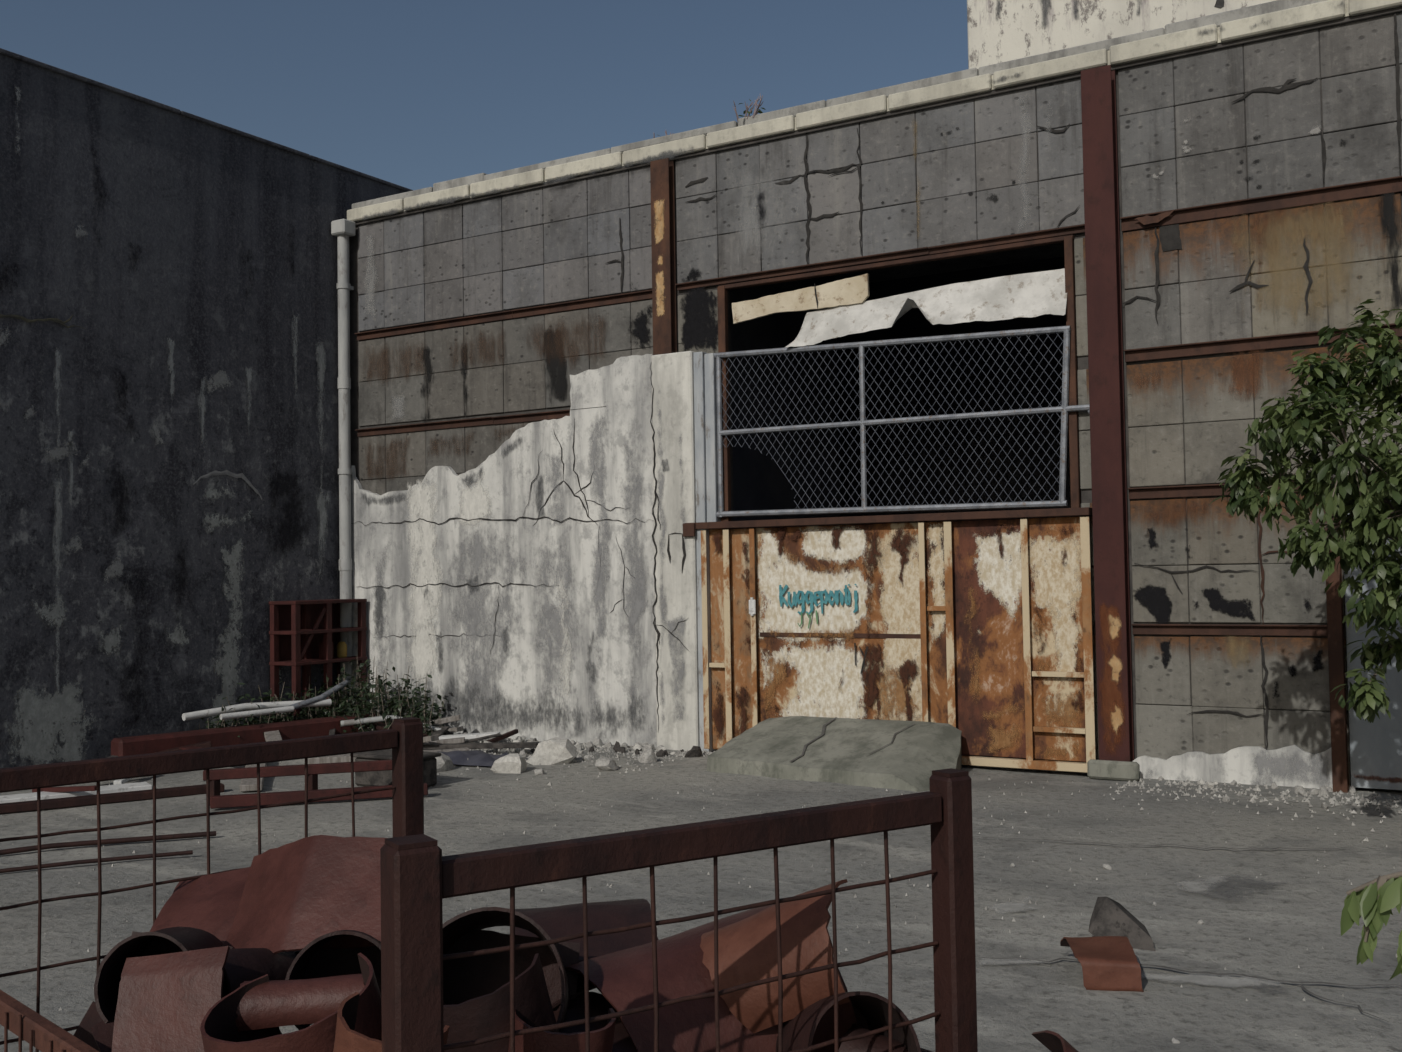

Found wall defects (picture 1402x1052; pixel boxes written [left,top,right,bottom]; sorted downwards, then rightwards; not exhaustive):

water stain [1041,0,1050,25]
crack [1229,260,1269,292]
crack [1303,238,1313,315]
water stain [315,343,326,447]
water stain [53,349,73,691]
water stain [268,466,329,575]
crack [351,362,690,729]
rust [980,525,1013,557]
rust [770,525,918,721]
rust [712,656,786,739]
crack [789,717,837,762]
rust [1099,604,1125,750]